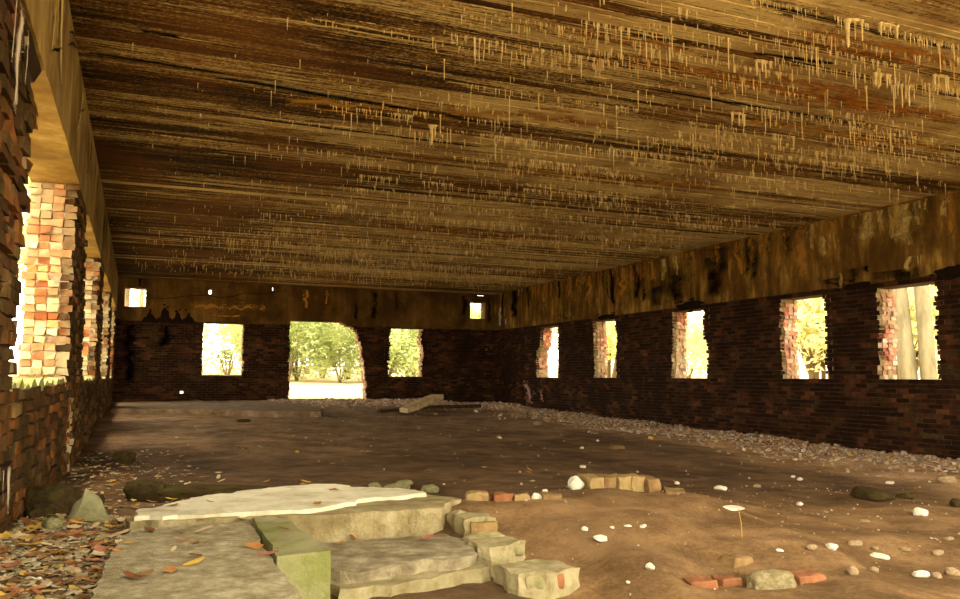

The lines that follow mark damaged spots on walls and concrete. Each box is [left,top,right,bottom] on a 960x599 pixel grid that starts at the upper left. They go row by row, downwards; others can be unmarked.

water stain [139,0,960,325]
rust [579,31,957,121]